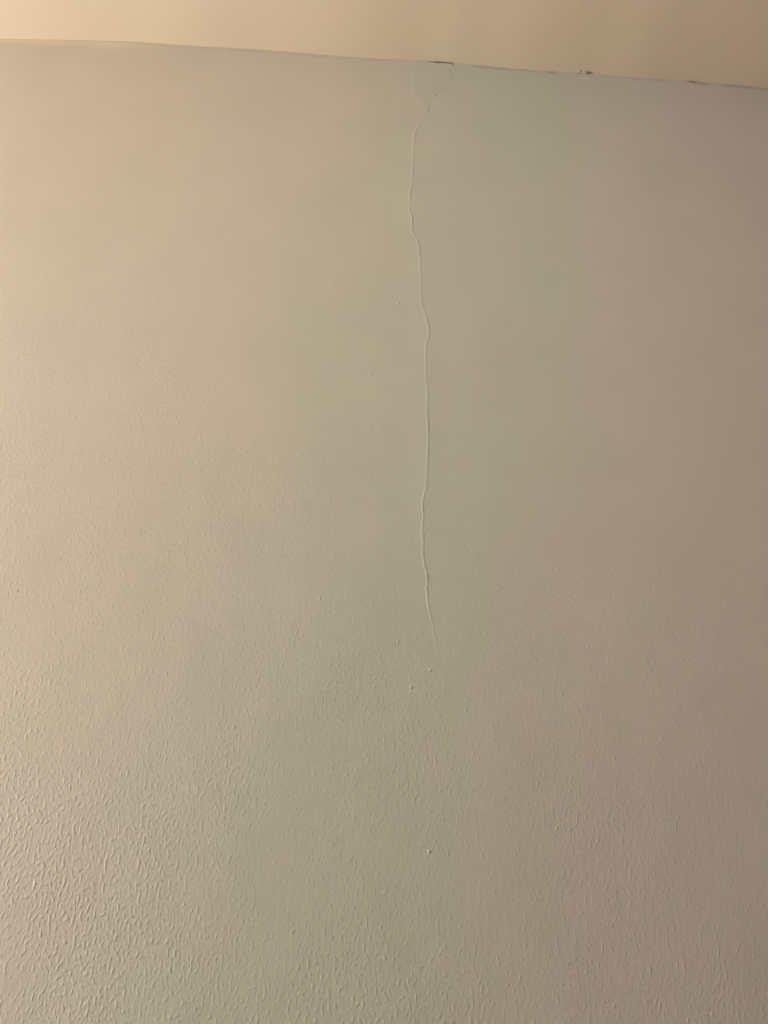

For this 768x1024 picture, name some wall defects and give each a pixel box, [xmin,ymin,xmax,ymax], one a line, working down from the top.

crack [407,108,446,699]